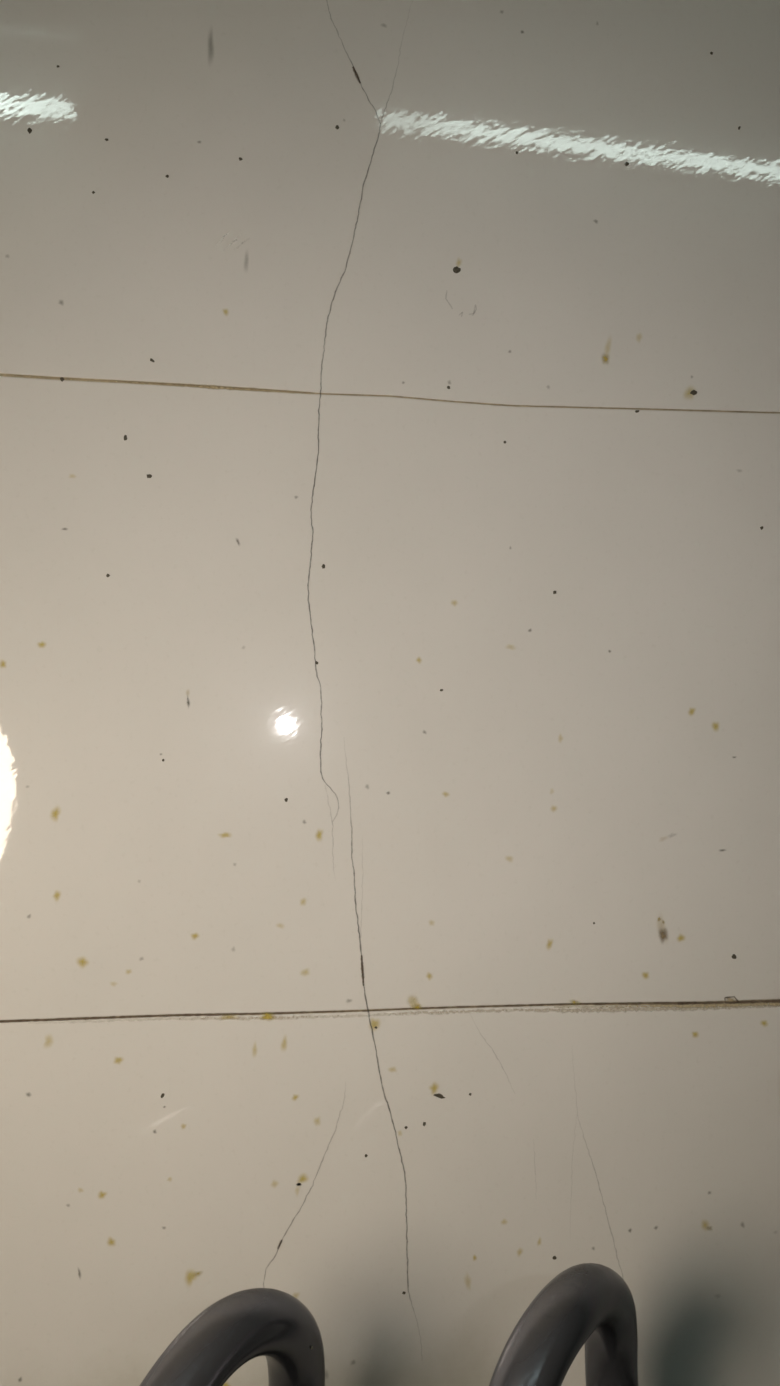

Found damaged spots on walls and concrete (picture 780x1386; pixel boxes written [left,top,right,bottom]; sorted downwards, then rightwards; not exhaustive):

crack [351,853,406,1181]